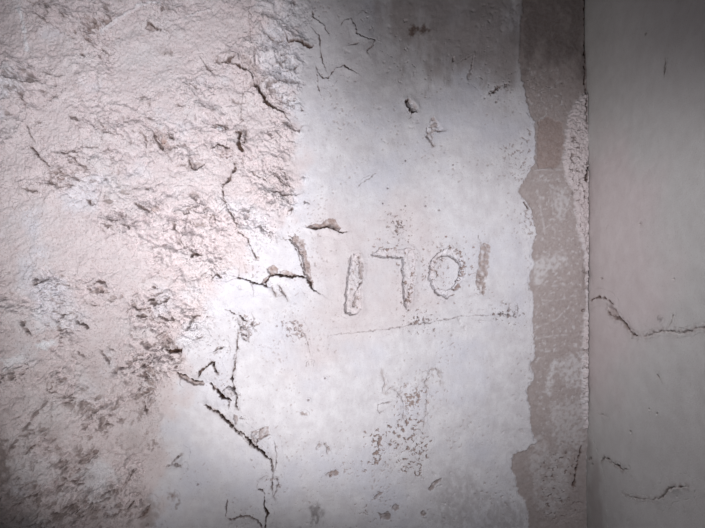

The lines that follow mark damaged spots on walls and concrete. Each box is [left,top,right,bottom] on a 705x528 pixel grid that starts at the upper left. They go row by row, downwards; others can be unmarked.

crack [167,0,383,528]
peeling [482,75,588,528]
crack [588,288,705,342]
crack [600,454,696,512]